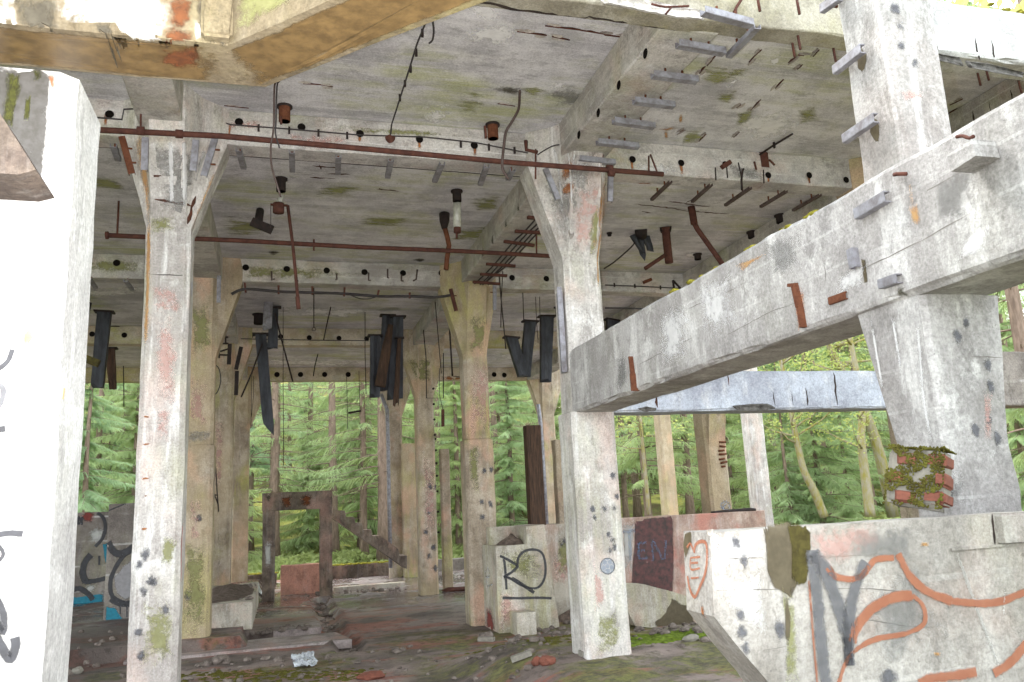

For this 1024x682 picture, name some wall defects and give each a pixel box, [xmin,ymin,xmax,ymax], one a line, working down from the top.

corrosion [164,0,197,67]
damp [0,0,214,175]
corrosion [787,283,807,328]
corrosion [628,356,640,391]